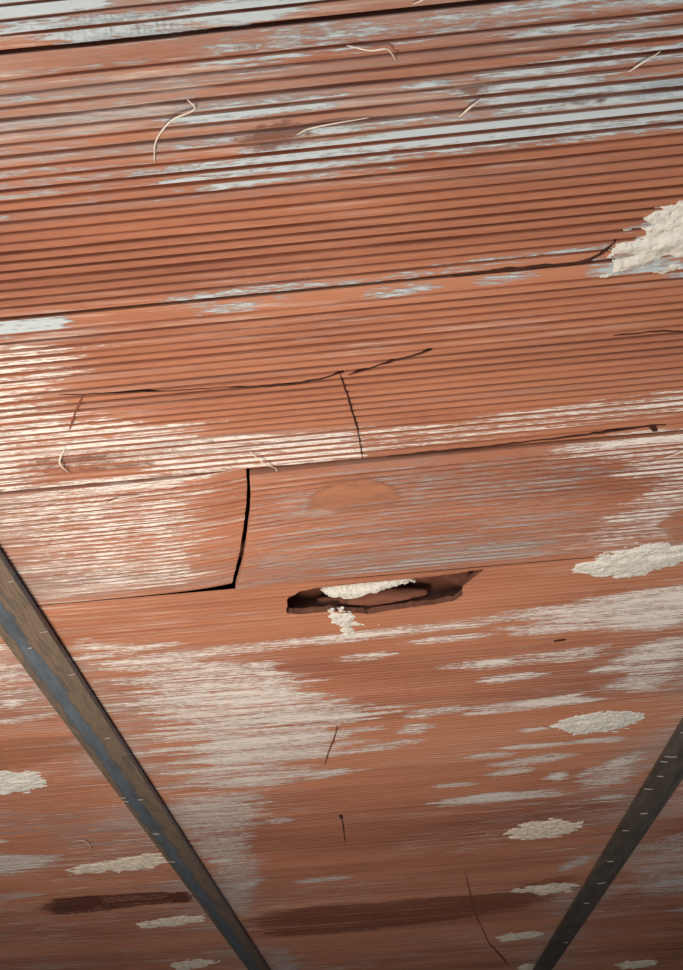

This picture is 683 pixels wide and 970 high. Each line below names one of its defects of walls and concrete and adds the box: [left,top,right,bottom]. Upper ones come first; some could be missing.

damp [0,0,683,200]
crack [452,239,616,276]
crack [59,348,432,459]
damp [0,316,683,596]
crack [387,424,666,457]
spalling [37,557,683,683]
damp [68,585,683,936]
damp [0,814,116,876]
crack [465,873,509,966]